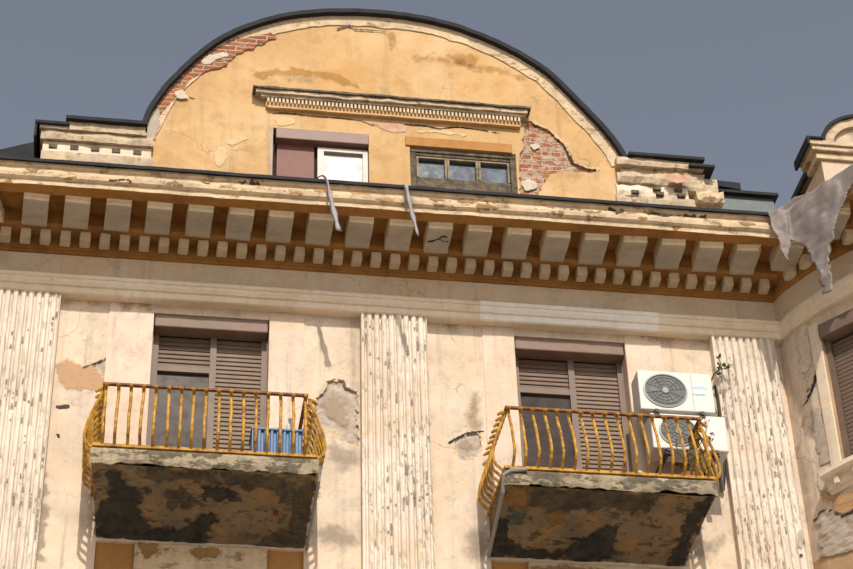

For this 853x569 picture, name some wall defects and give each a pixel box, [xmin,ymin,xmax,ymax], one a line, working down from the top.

flaking render [145,32,277,139]
leakage [255,67,359,88]
crack [404,124,500,137]
flaking render [515,120,599,195]
peeling [56,358,106,392]
flaking render [312,378,367,448]
crack [803,372,817,406]
leakage [92,466,320,559]
leakage [491,524,619,569]
leakage [525,486,661,516]
leakage [667,496,714,567]
flaking render [810,407,853,558]